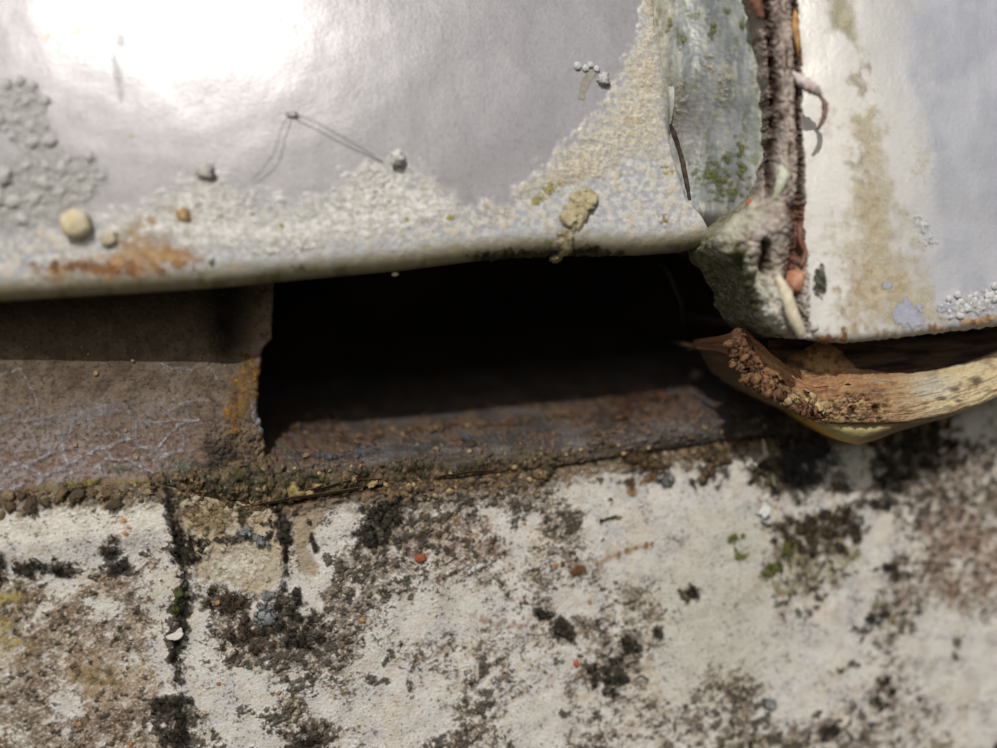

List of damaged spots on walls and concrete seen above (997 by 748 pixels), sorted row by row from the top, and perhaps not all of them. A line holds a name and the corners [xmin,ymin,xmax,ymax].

damp [103,159,468,259]
corrosion [48,216,192,281]
damp [618,451,669,496]
damp [689,436,743,490]
damp [778,432,831,489]
crack [0,403,199,748]